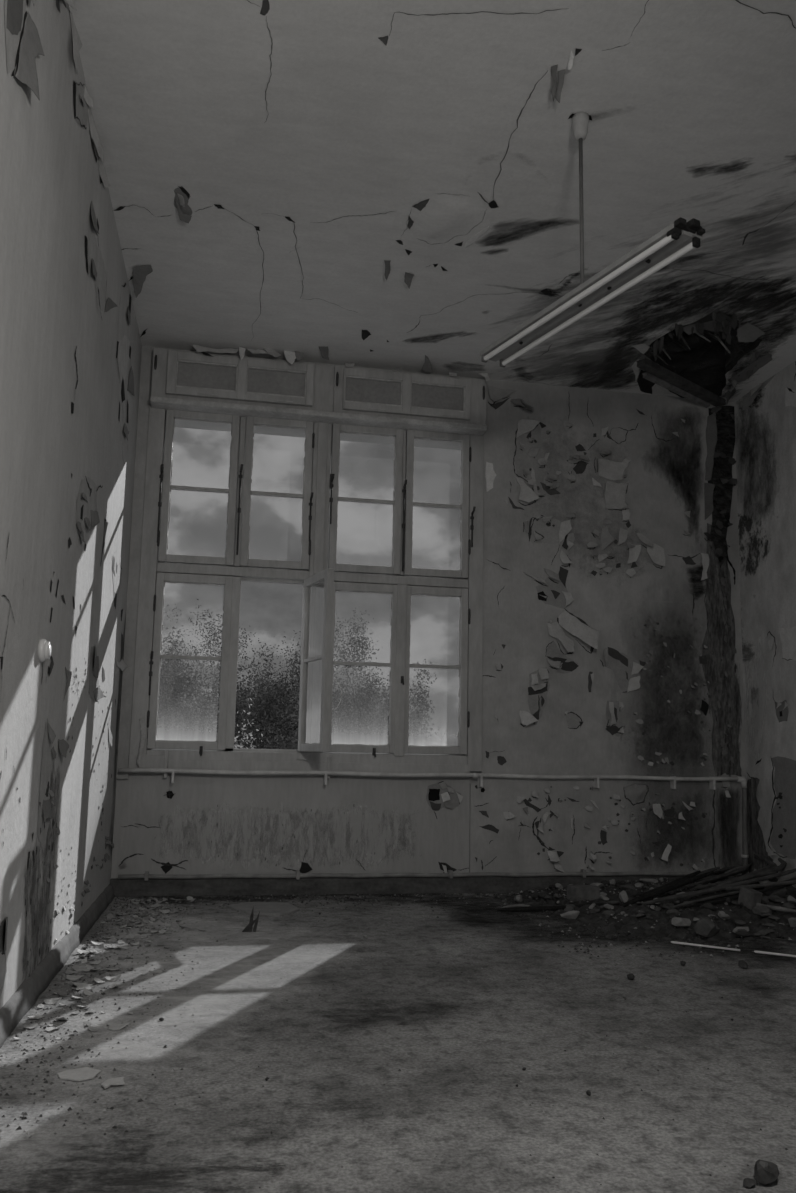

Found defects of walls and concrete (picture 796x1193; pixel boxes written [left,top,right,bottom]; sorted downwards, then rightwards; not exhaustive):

peeling [4,0,44,100]
crack [247,0,273,122]
crack [379,8,569,45]
crack [489,72,547,208]
leakage [693,162,745,174]
peeling [85,202,153,440]
crack [214,204,394,339]
leakage [540,268,587,296]
leakage [571,278,796,397]
leakage [738,408,771,575]
peeling [68,473,128,702]
flaking render [488,311,796,872]